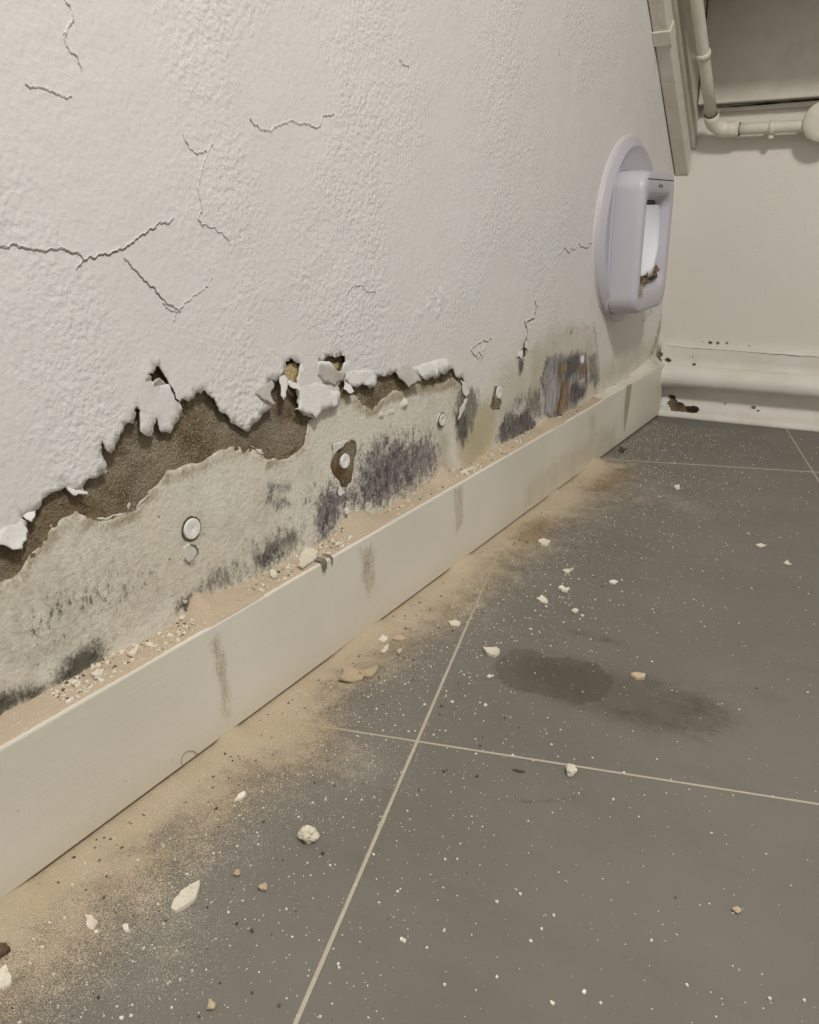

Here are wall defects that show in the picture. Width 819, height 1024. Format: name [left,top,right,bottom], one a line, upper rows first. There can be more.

crack [63,0,82,71]
crack [25,83,73,99]
crack [250,112,335,133]
crack [0,134,229,322]
flaking render [490,386,502,410]
spalling [661,394,699,413]
flaking render [0,355,470,582]
mould [176,427,440,612]
mould [19,554,163,645]
mould [0,639,103,715]
flaking render [378,635,406,655]
flaking render [483,646,500,658]